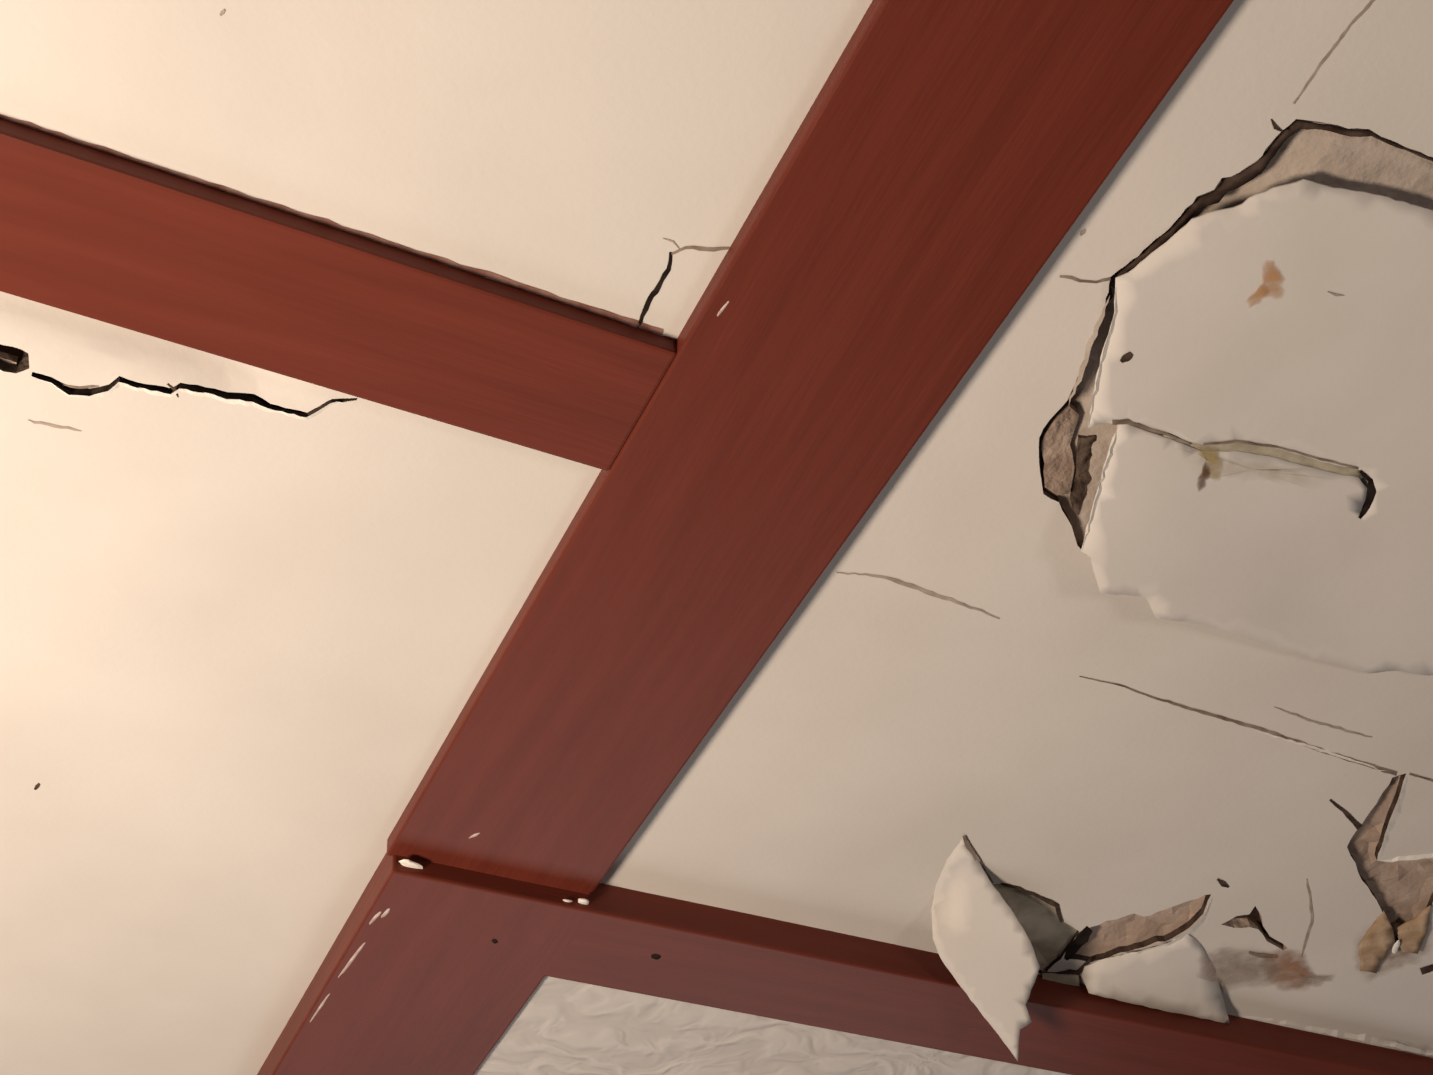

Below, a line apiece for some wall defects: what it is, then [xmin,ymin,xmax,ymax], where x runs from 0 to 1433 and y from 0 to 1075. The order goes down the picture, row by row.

crack [1293,0,1375,104]
crack [637,238,730,328]
crack [0,344,357,431]
peeling [1039,119,1433,676]
crack [1079,676,1433,782]
peeling [931,836,1080,1061]
spalling [1235,1014,1433,1055]